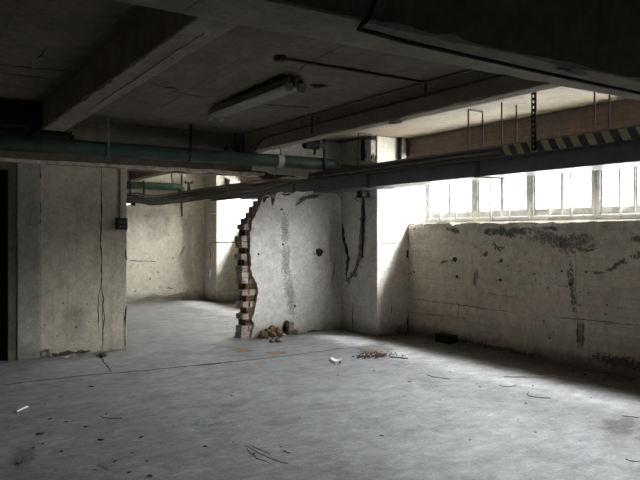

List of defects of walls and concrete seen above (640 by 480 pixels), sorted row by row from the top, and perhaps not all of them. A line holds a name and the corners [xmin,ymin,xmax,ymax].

crack [97,167,105,329]
water stain [484,226,596,257]